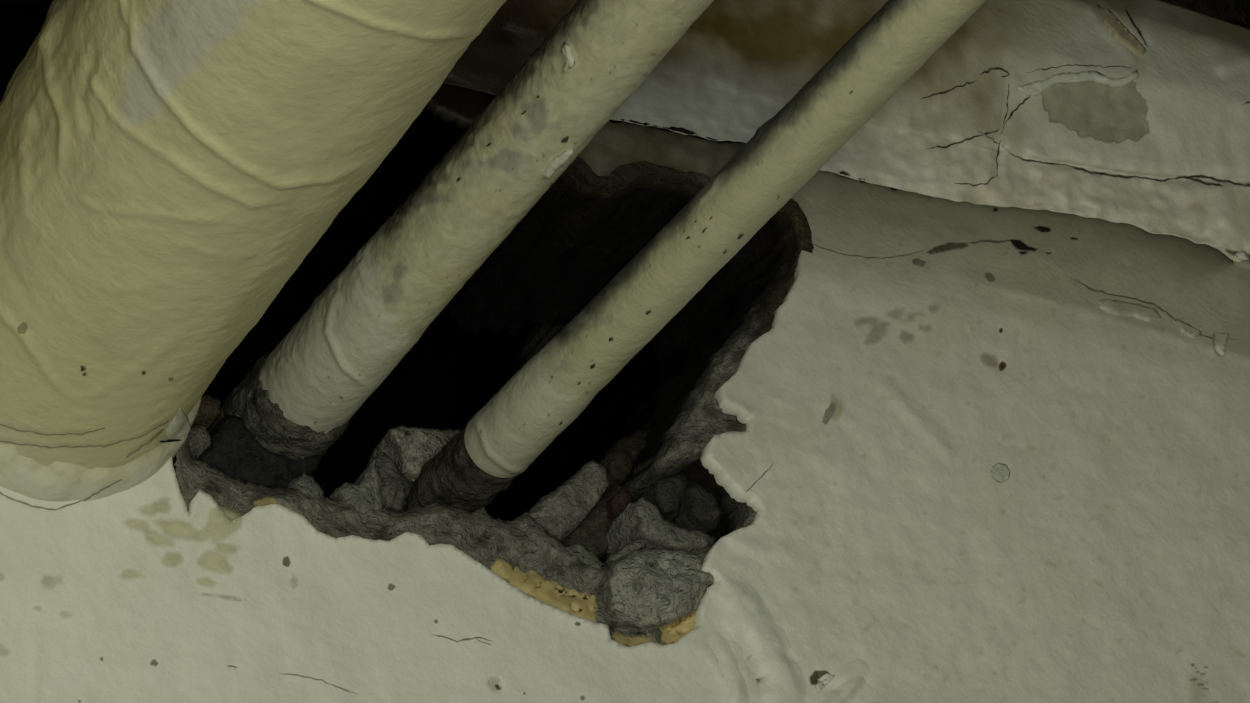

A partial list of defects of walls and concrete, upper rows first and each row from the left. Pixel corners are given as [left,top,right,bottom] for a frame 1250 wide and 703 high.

peeling [1016,3,1149,143]
crack [922,64,1250,186]
spalling [443,136,714,335]
spalling [620,198,814,562]
leakage [129,500,241,585]
spalling [160,408,697,647]